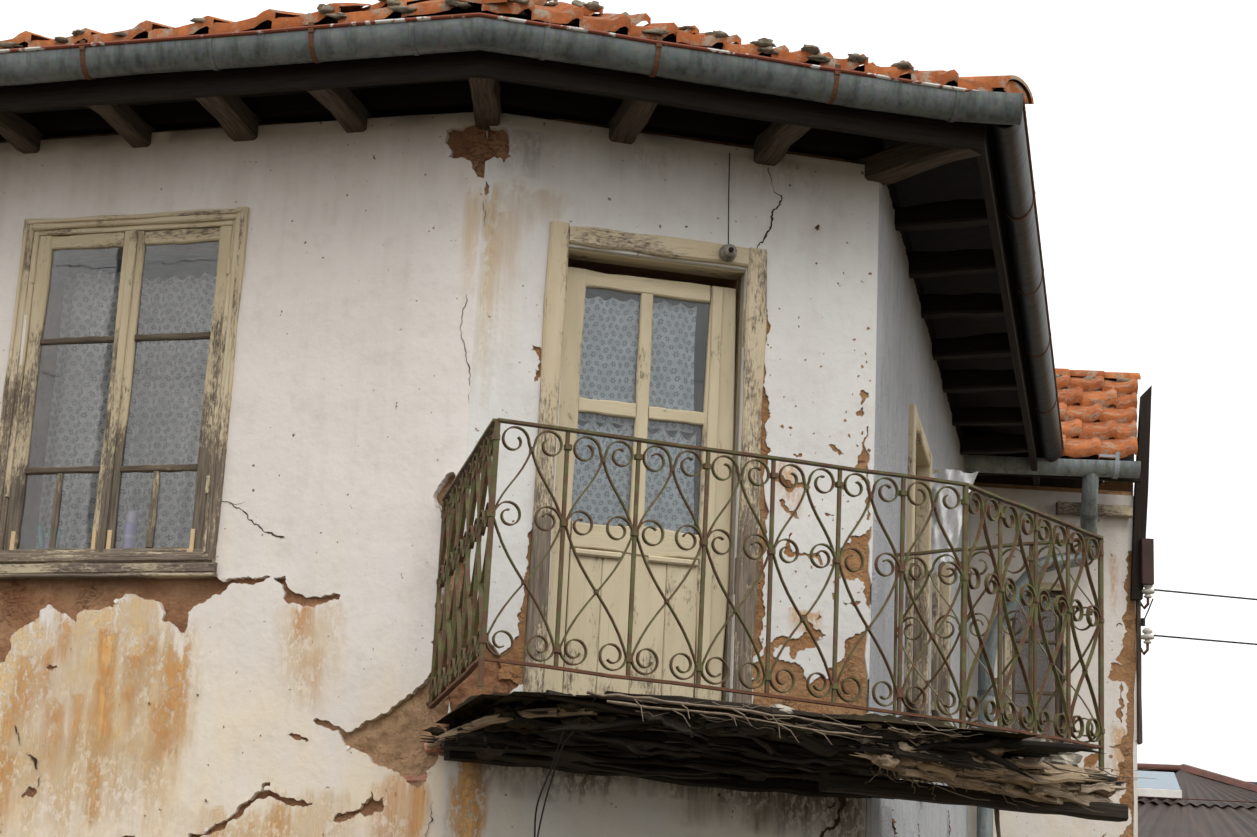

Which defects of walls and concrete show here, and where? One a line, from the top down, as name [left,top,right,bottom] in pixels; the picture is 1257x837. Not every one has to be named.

flaking render [447,125,510,195]
crack [757,168,783,248]
flaking render [532,346,541,382]
flaking render [435,475,455,511]
flaking render [752,339,871,715]
flaking render [0,577,341,663]
leakage [0,596,187,812]
flaking render [315,528,532,823]
flaking render [1083,551,1136,837]
flaking render [191,783,312,837]
crack [819,797,846,837]